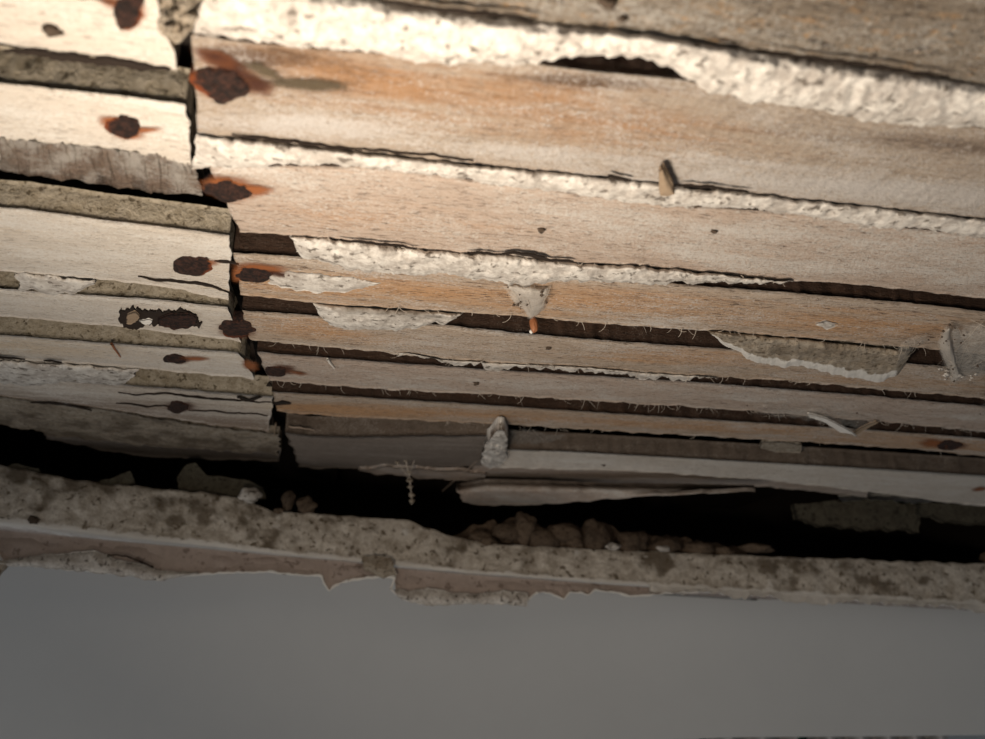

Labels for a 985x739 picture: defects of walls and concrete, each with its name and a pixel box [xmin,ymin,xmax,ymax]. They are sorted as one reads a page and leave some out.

corrosion [197,49,272,96]
spalling [157,0,985,128]
corrosion [121,128,159,139]
corrosion [205,178,271,195]
spalling [191,124,985,237]
corrosion [233,264,290,281]
spalling [267,235,793,332]
peeling [126,310,197,330]
spalling [707,330,910,383]
spalling [0,359,282,455]
spalling [481,416,508,469]
peeling [0,530,698,607]